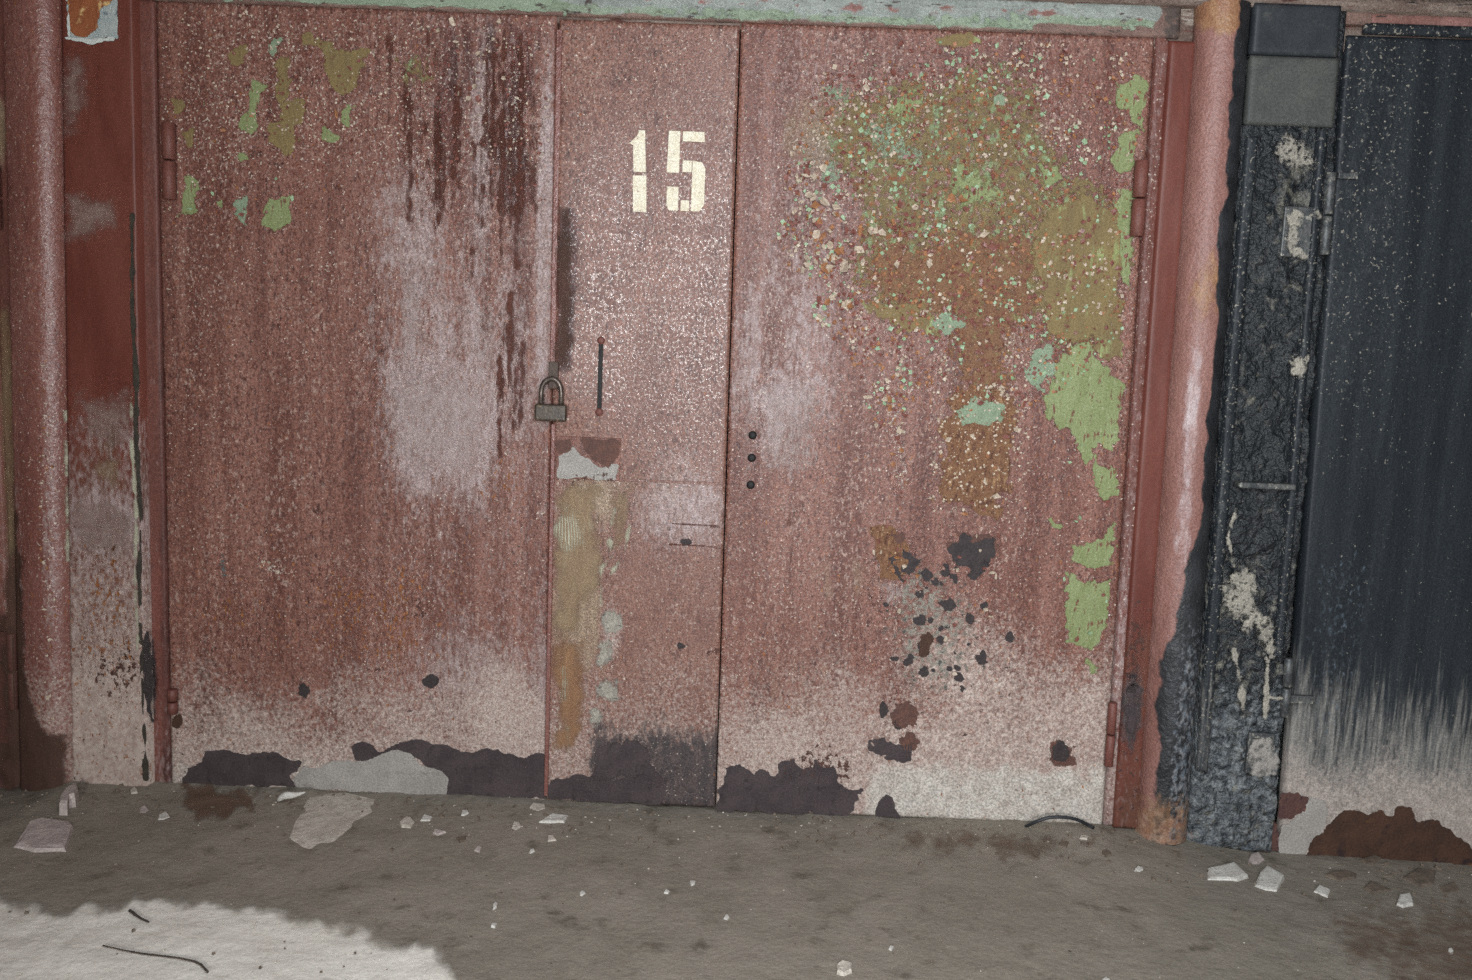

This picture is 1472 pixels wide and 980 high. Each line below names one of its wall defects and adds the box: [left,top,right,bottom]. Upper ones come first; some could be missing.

peeling [626,7,795,21]
peeling [160,0,567,256]
spalling [1275,133,1315,172]
spalling [1287,209,1321,259]
peeling [776,12,1154,674]
spalling [1290,355,1309,378]
peeling [555,437,621,486]
leakage [0,508,1472,980]
spalling [1248,737,1279,777]